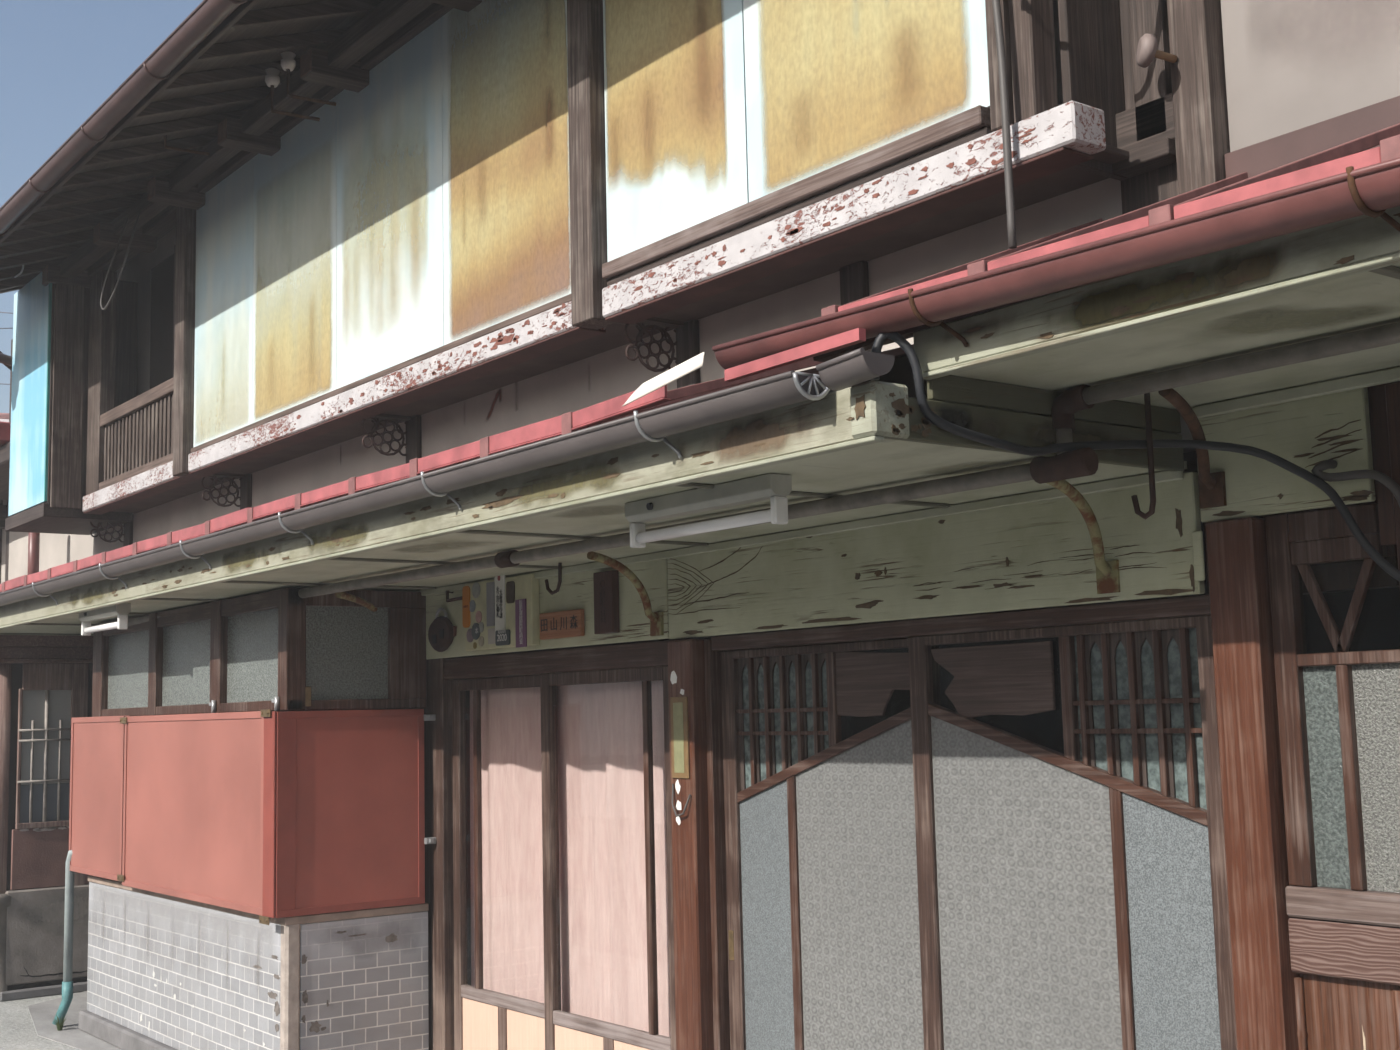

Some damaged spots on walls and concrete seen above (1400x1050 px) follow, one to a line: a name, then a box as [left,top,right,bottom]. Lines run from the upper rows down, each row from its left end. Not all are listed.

damp [1069,250,1279,328]
damp [1219,309,1379,333]
peeling [1175,508,1183,537]
peeling [913,557,1044,599]
peeling [1066,564,1195,603]
peeling [756,600,883,629]